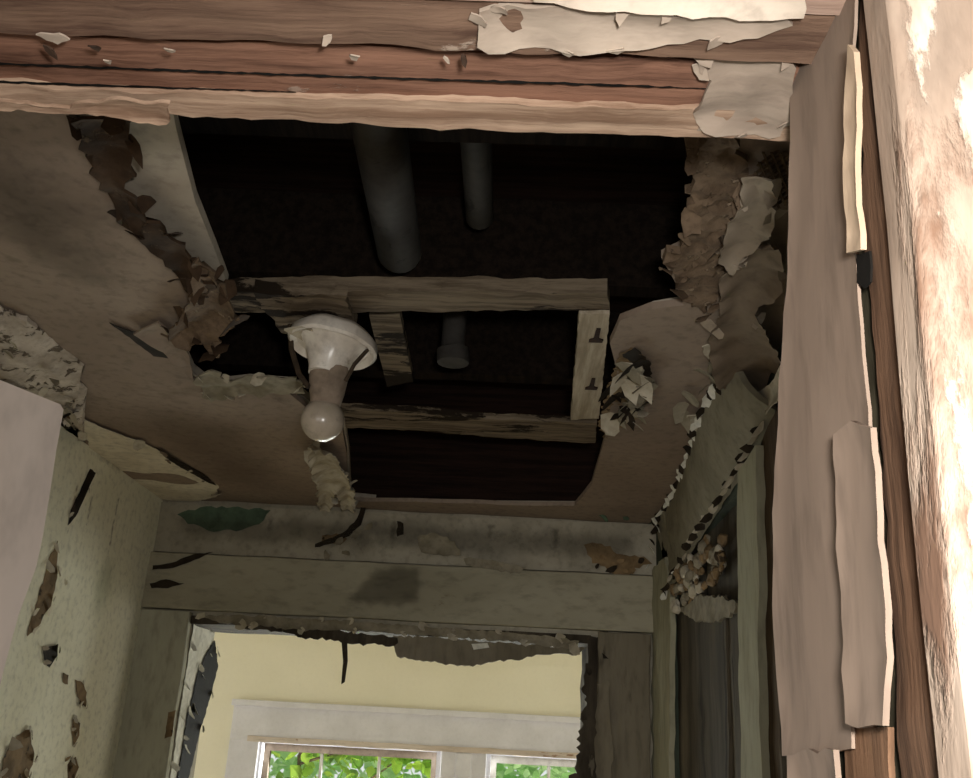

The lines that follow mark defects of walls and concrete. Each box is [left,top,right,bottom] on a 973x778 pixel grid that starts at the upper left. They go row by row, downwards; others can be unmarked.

peeling [905,0,939,98]
peeling [954,69,973,169]
peeling [167,257,225,327]
peeling [250,372,267,386]
peeling [469,0,894,778]
peeling [945,379,973,545]
peeling [27,541,62,636]
flaking render [0,726,38,778]
flaking render [42,644,61,668]
peeling [63,673,88,778]
peeling [170,624,220,778]